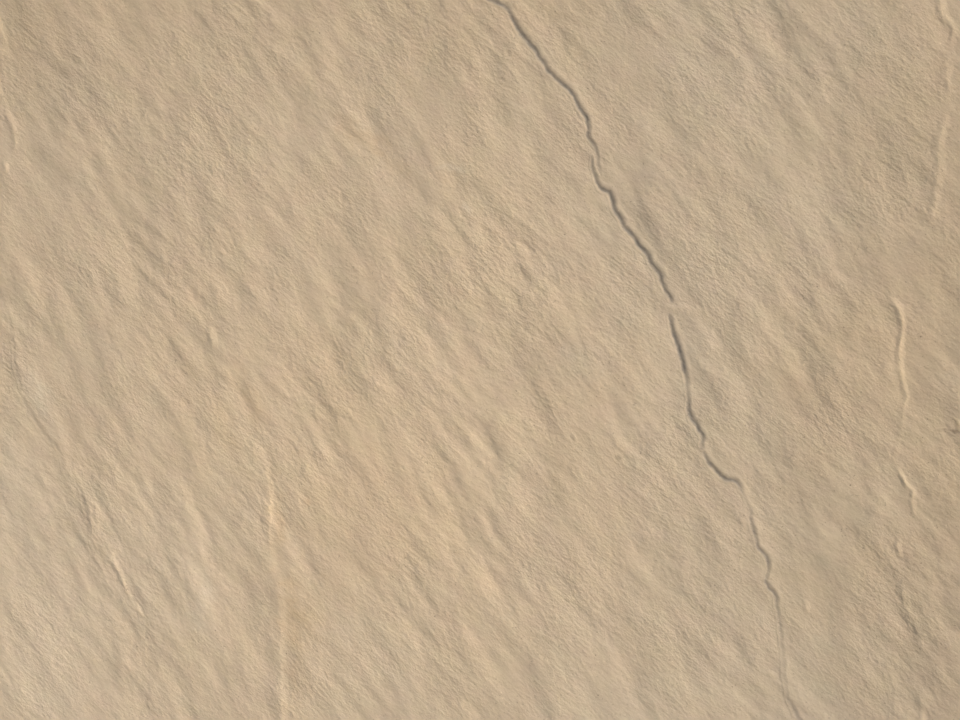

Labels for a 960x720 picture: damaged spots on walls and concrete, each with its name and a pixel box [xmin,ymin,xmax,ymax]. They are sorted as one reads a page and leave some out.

crack [479,0,809,720]